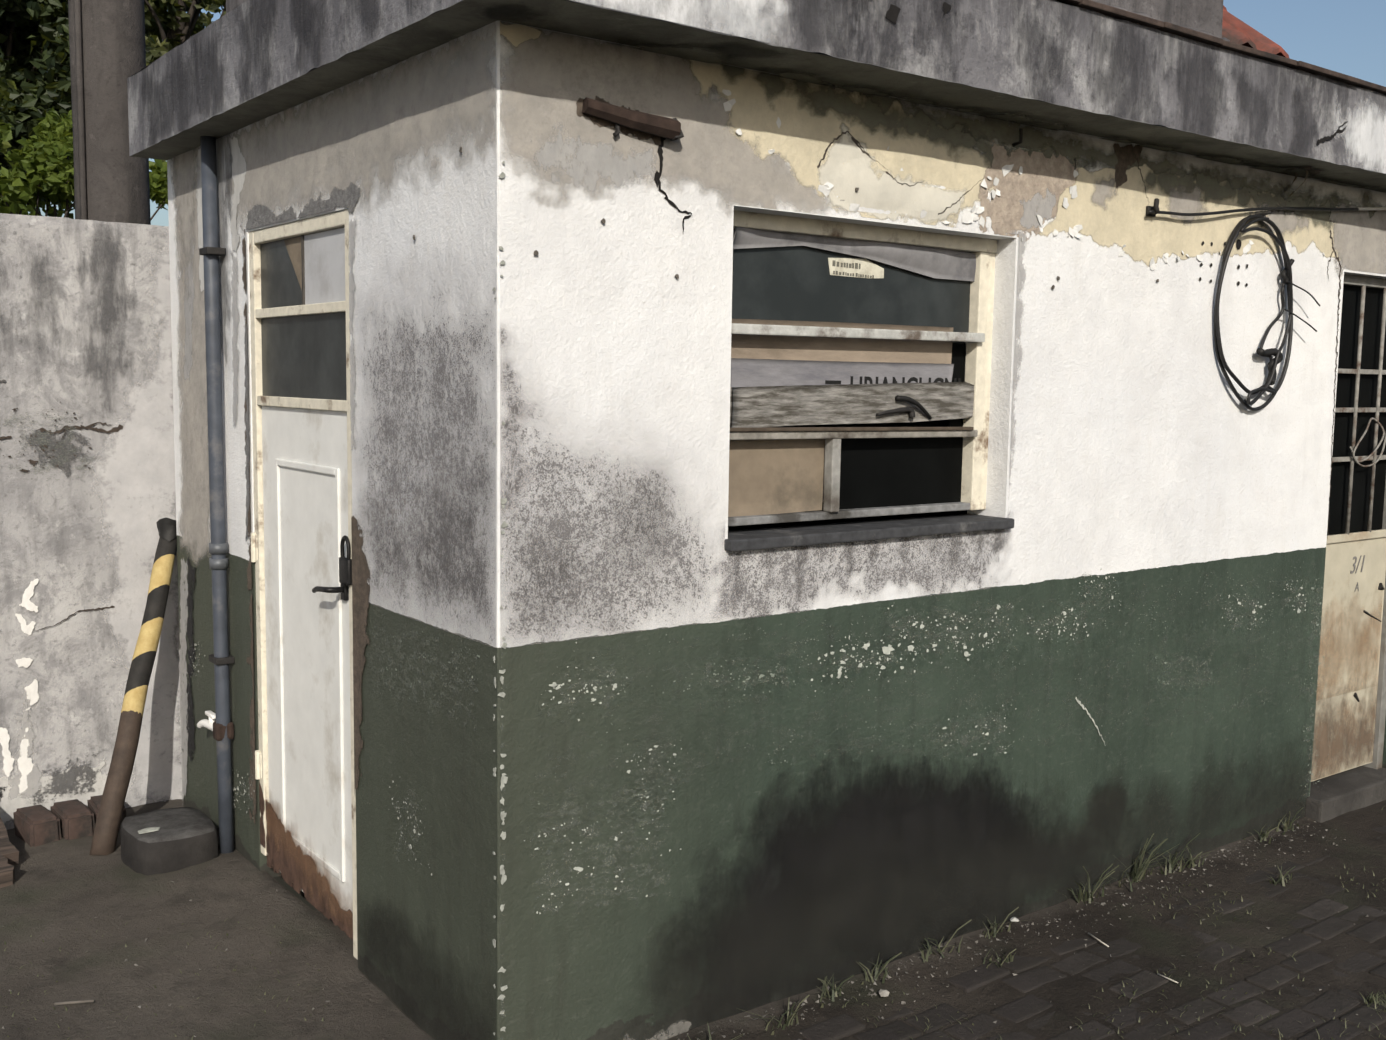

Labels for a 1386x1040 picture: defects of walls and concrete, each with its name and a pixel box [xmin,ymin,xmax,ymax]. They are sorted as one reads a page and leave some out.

water stain [143,38,222,144]
crack [654,137,692,232]
peeling [689,60,1340,270]
water stain [78,222,127,380]
water stain [173,0,1386,562]
crack [0,422,123,459]
water stain [357,272,1009,643]
corrosion [1312,700,1377,780]
corrosion [259,782,353,940]